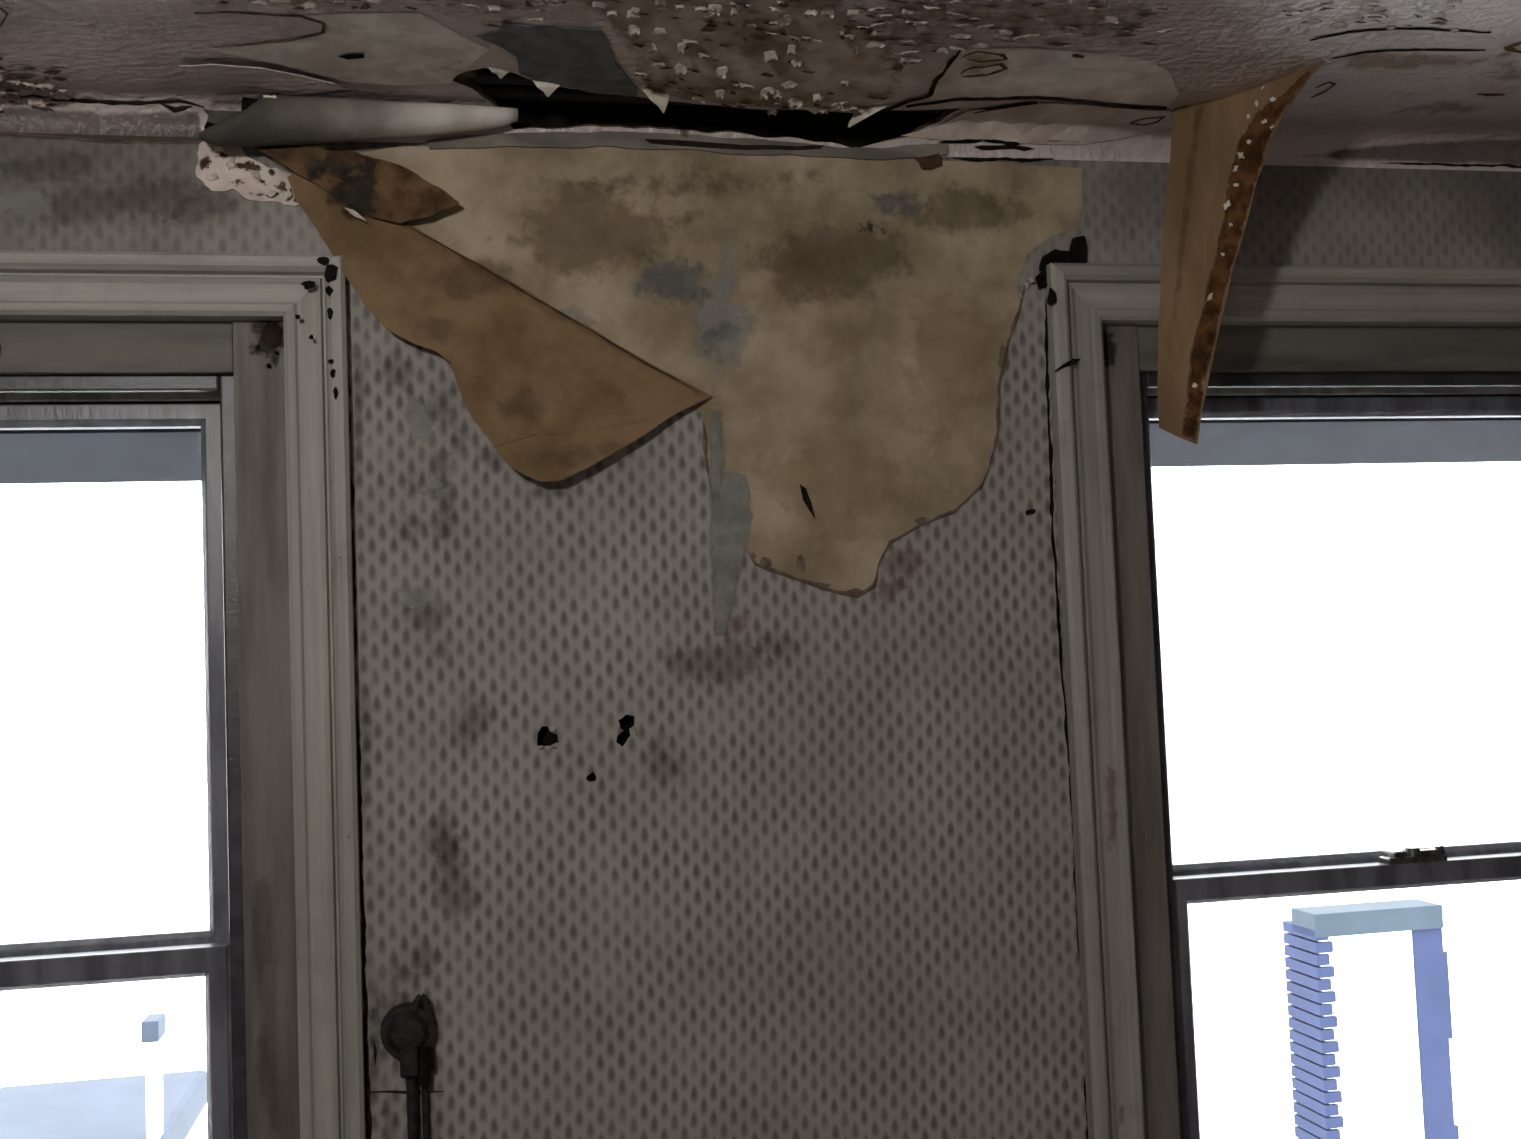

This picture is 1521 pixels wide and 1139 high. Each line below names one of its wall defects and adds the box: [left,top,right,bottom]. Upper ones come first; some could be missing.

flaking render [179,0,1181,598]
damp [576,0,904,116]